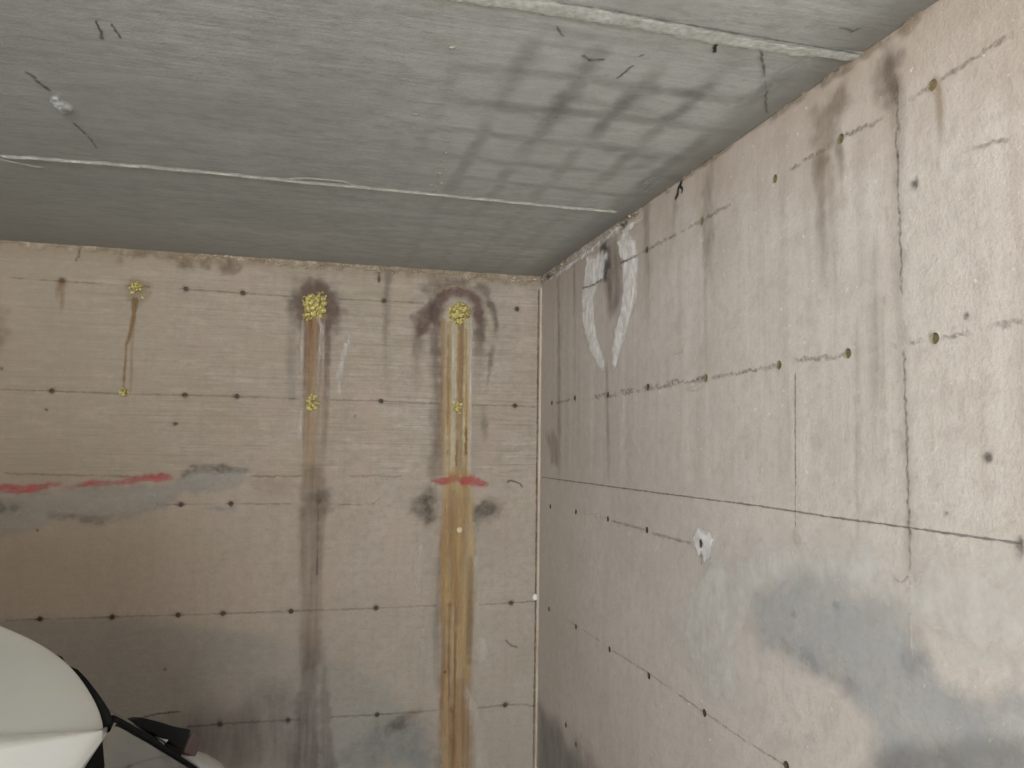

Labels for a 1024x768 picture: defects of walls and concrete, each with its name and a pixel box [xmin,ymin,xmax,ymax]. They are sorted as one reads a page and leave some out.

rust [126,298,137,346]
leakage [418,285,497,336]
leakage [581,238,637,369]
rust [441,320,473,768]